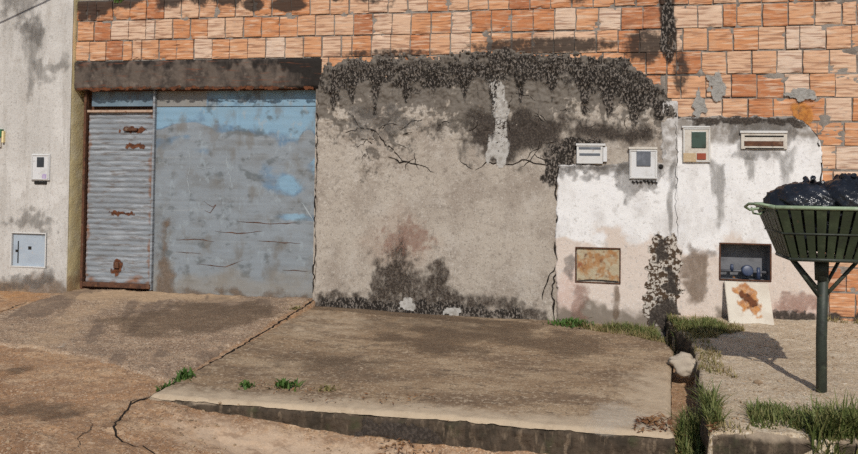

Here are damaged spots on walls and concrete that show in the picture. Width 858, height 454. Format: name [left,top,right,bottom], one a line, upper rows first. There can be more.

rust [119,126,146,149]
crack [345,115,450,172]
crack [460,93,596,318]
leakage [315,240,548,320]
rust [733,283,762,317]